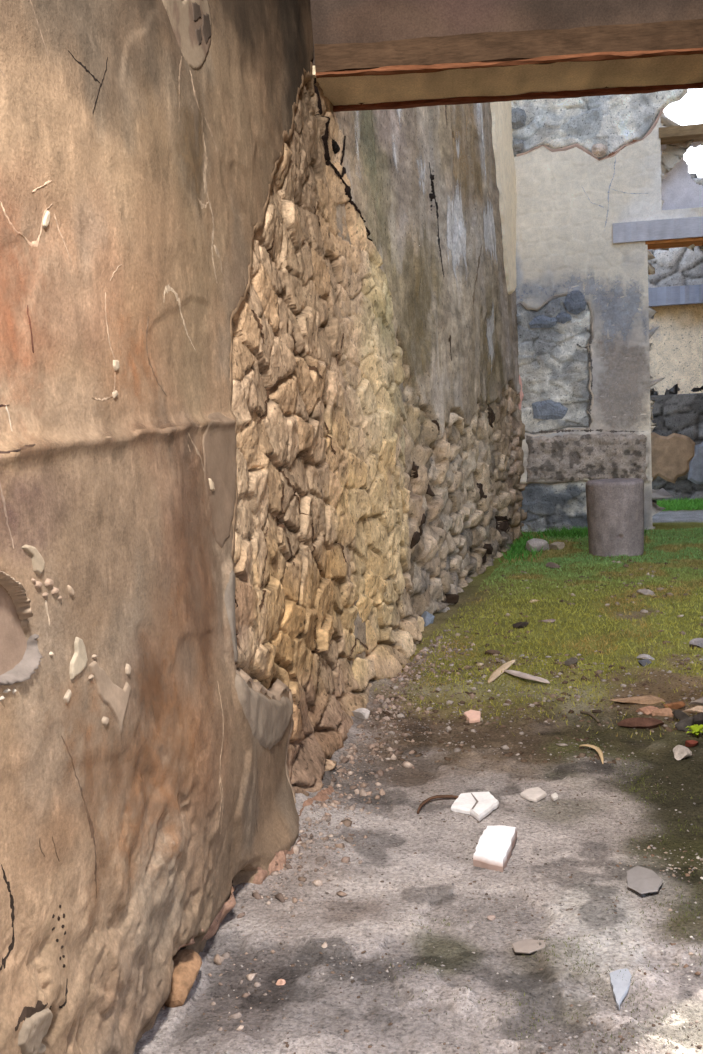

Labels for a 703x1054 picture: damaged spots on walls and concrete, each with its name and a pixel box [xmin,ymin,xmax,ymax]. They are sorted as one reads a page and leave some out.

crack [30,0,108,113]
peeling [162,0,212,70]
crack [314,78,372,241]
spalling [511,89,688,161]
crack [429,162,444,276]
crack [188,433,205,471]
spalling [178,62,594,951]
crack [0,864,15,971]
crack [15,979,68,1031]